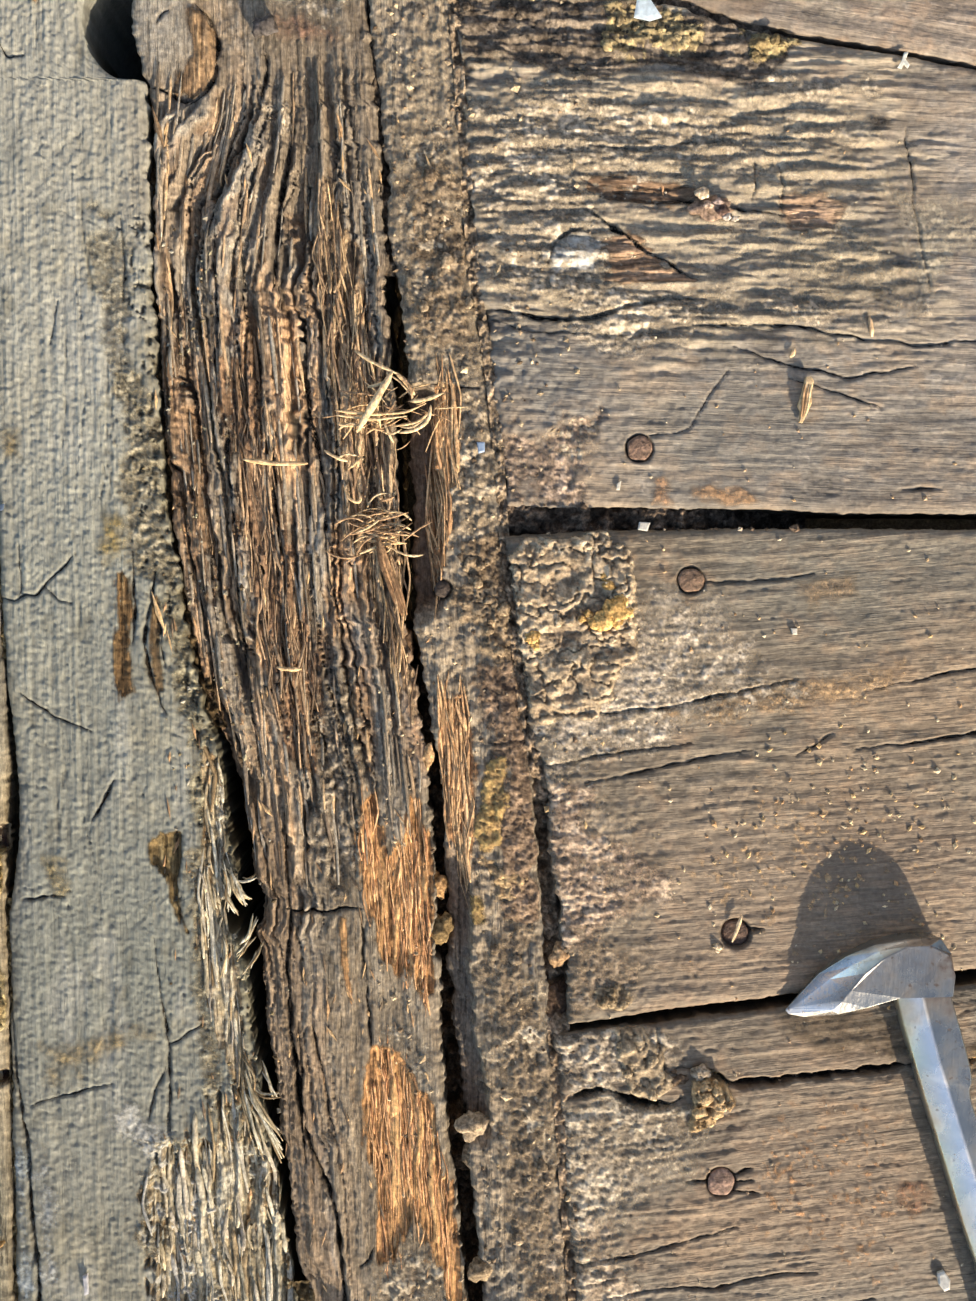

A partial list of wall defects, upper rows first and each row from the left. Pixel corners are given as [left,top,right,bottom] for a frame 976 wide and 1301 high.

crack [492,204,976,436]
crack [873,668,975,690]
crack [568,743,723,781]
crack [797,731,976,755]
crack [584,1030,910,1106]
peeling [362,1025,466,1301]
crack [691,1168,756,1193]
peeling [135,1134,224,1301]
crack [667,1272,808,1289]